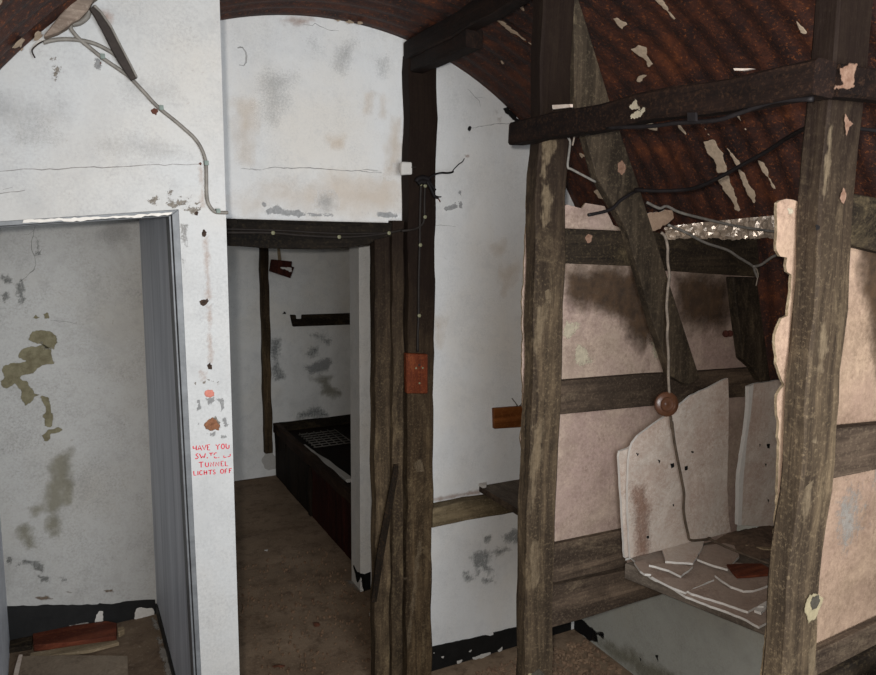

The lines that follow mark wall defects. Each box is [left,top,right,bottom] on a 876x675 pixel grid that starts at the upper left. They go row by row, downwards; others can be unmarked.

crack [0,164,194,194]
crack [244,166,382,174]
peeling [704,129,756,211]
leakage [567,268,658,358]
leakage [563,320,592,367]
leakage [306,349,339,393]
peeling [197,397,229,438]
leakage [474,530,518,582]